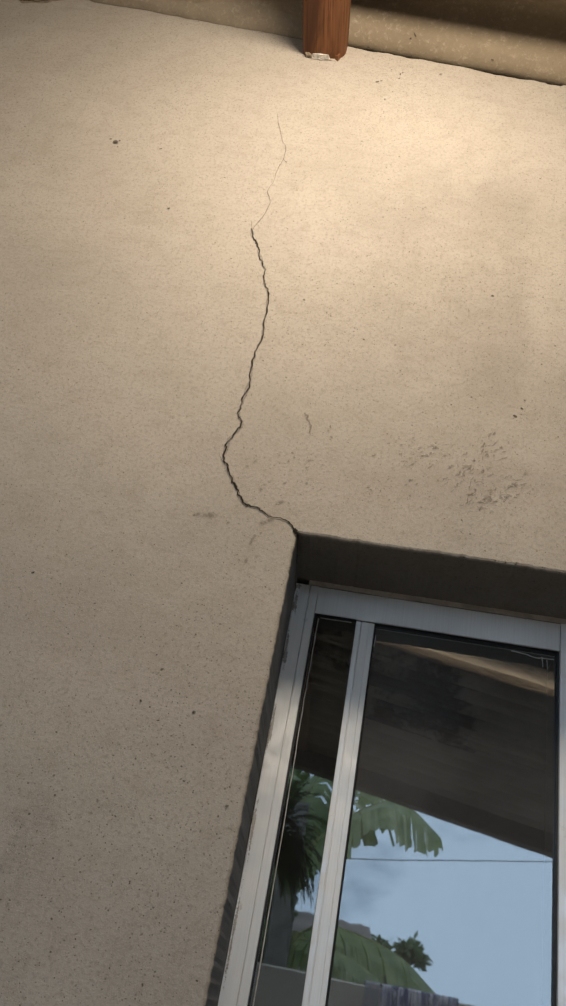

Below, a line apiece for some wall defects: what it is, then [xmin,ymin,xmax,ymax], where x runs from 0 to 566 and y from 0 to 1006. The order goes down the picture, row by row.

crack [220,114,298,780]